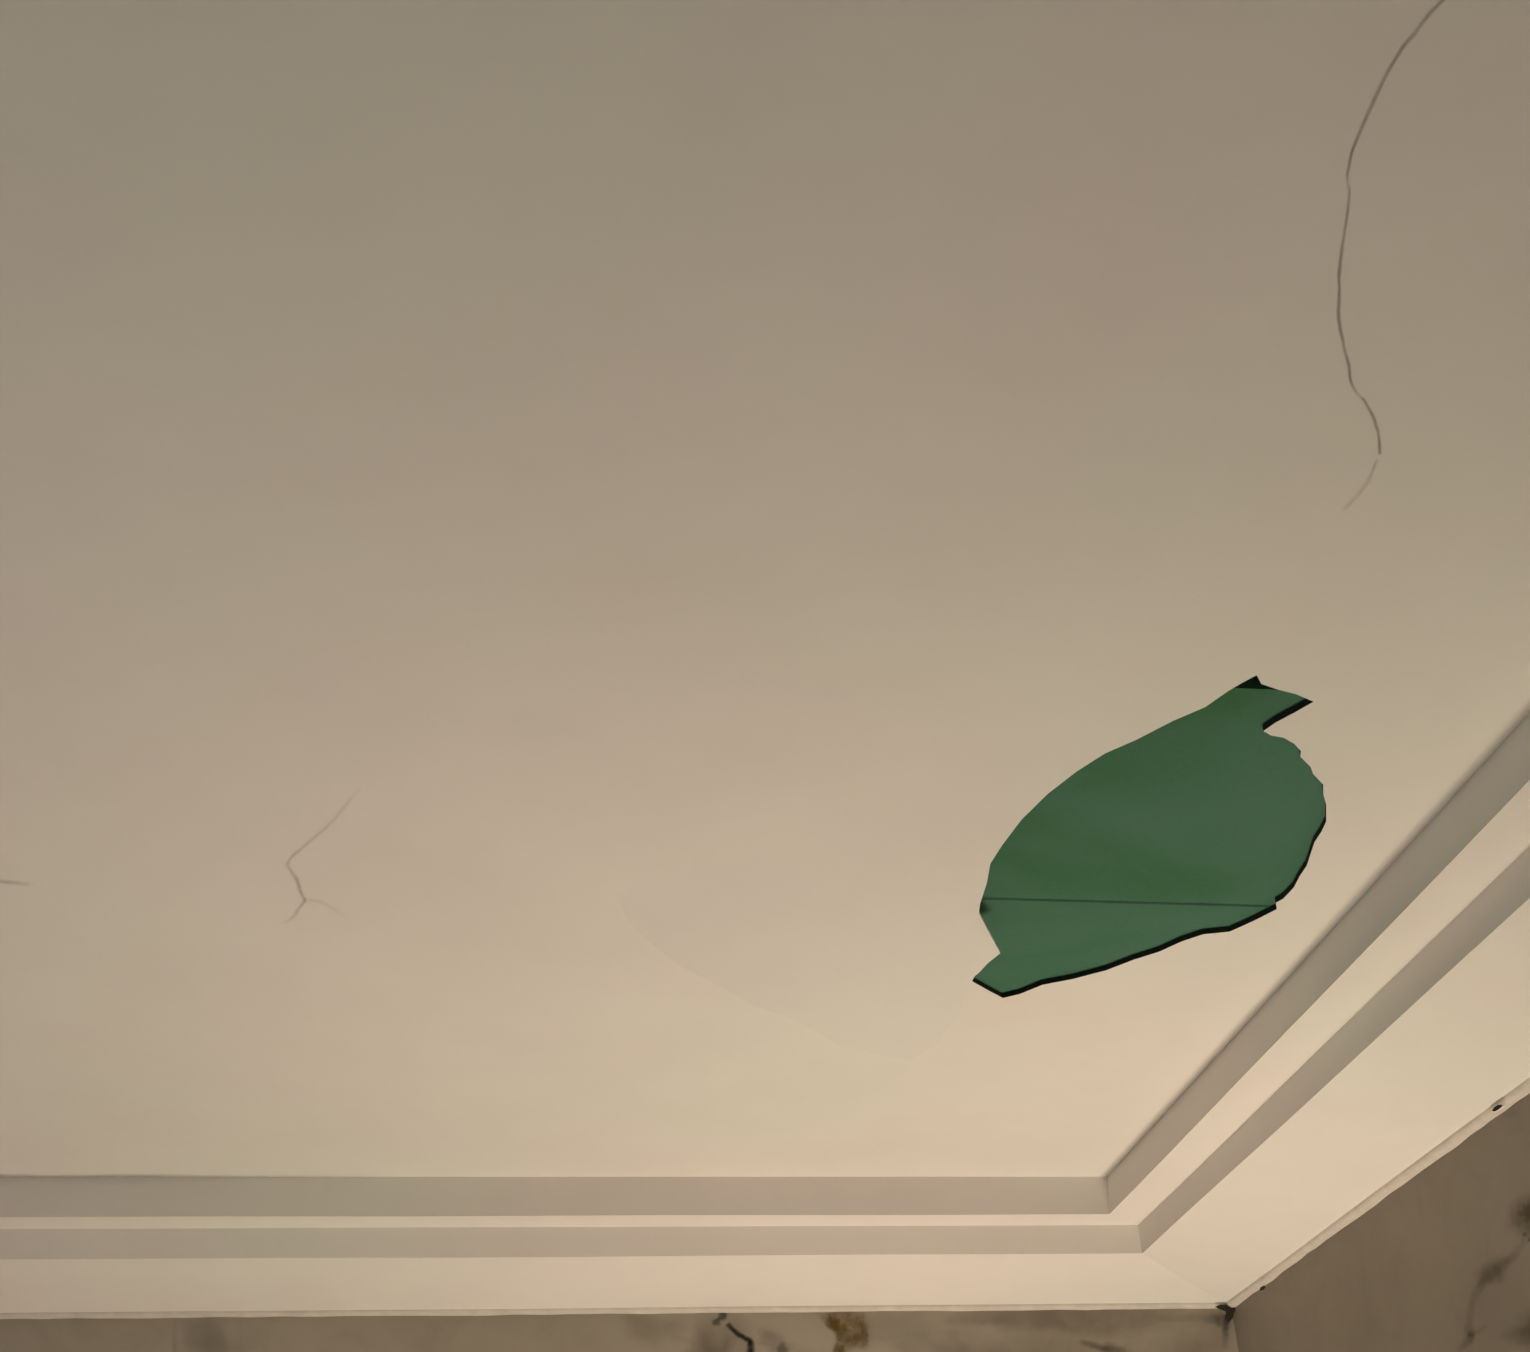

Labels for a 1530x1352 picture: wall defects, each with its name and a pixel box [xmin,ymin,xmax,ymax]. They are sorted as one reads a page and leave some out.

flaking render [613,676,1326,1061]